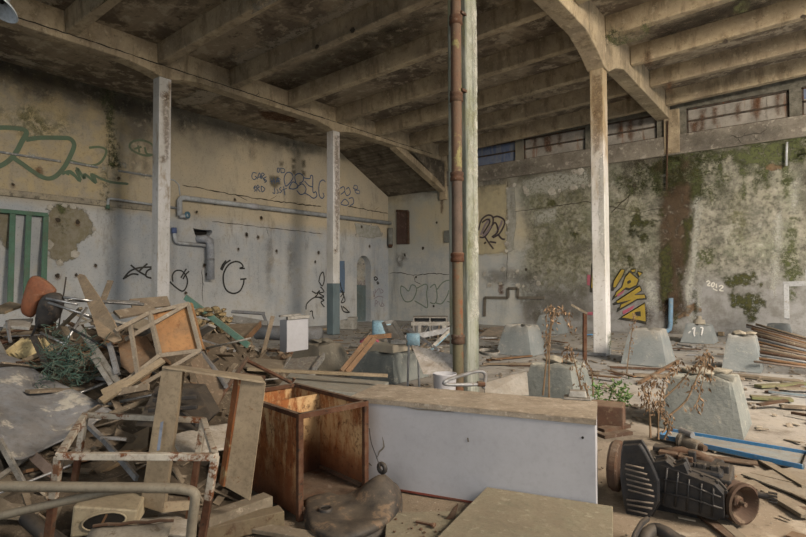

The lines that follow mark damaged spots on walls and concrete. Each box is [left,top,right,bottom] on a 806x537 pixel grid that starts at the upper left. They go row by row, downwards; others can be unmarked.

peeling [0,213,10,248]
peeling [40,203,96,279]
leakage [645,152,704,333]